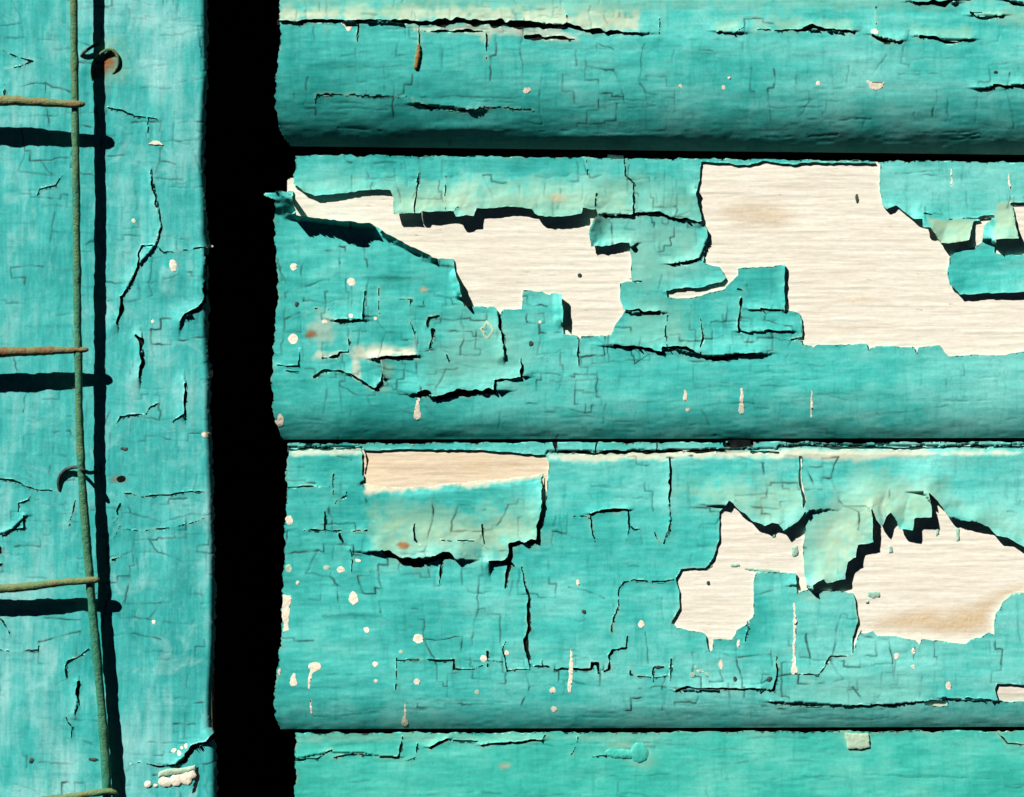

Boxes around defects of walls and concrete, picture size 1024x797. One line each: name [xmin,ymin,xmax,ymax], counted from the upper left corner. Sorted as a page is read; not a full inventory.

crack [277,16,661,59]
corrosion [99,55,114,71]
crack [109,107,157,140]
crack [315,94,389,104]
crack [415,103,532,112]
crack [116,170,209,379]
peeling [264,158,1024,396]
crack [117,384,187,422]
peeling [356,444,552,515]
peeling [372,521,451,563]
peeling [669,456,1024,653]
crack [381,478,917,707]